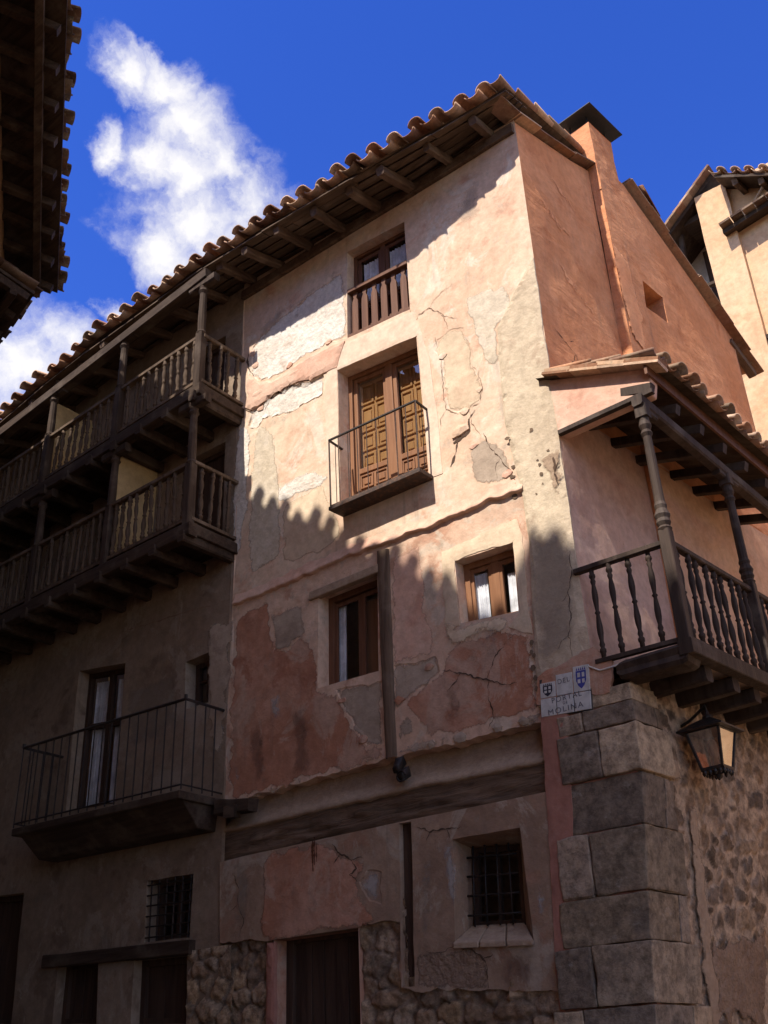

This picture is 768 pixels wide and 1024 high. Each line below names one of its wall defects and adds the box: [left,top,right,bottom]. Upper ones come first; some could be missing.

peeling [233,274,346,553]
crack [409,286,511,474]
peeling [469,437,516,482]
peeling [208,547,540,799]
crack [443,633,518,729]
crack [332,844,363,881]